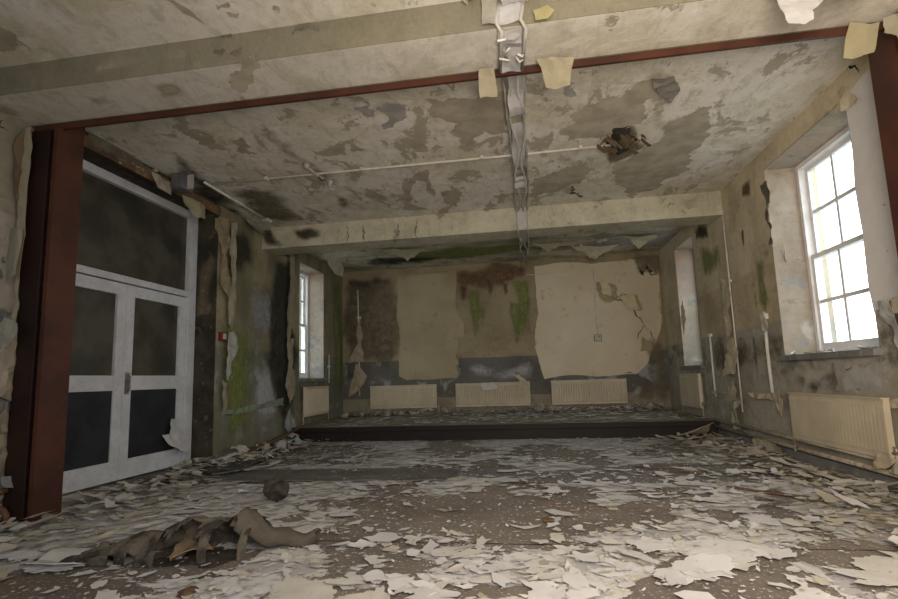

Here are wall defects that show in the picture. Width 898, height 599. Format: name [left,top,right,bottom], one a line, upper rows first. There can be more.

peeling [168,0,204,24]
peeling [182,131,251,152]
peeling [354,103,407,130]
peeling [426,90,514,145]
peeling [559,79,712,194]
peeling [364,170,462,210]
peeling [529,165,592,198]
water stain [228,235,250,270]
peeling [570,228,682,251]
water stain [226,263,298,416]
peeling [395,270,464,380]
peeling [534,259,662,379]